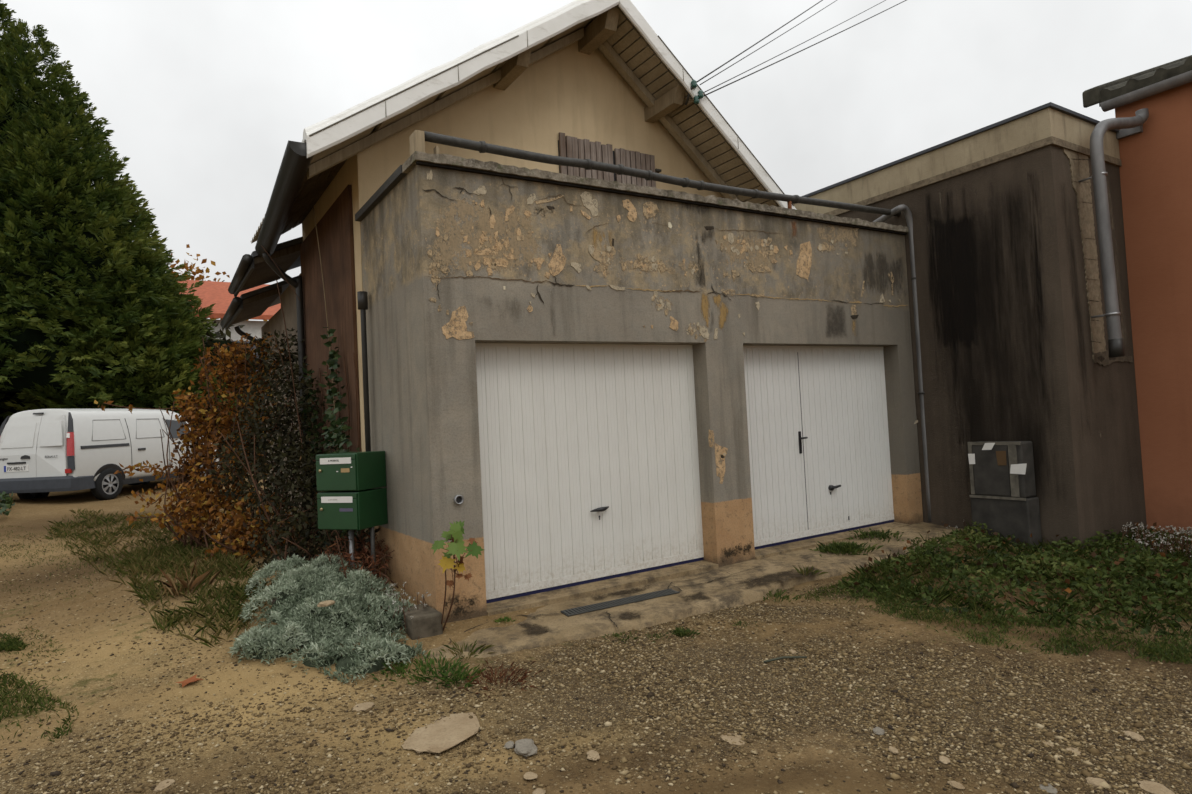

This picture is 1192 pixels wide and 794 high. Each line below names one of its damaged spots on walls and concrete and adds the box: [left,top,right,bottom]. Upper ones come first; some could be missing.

peeling [427,186,698,340]
crack [428,252,906,307]
peeling [705,226,850,281]
water stain [927,193,1043,485]
peeling [708,430,728,484]